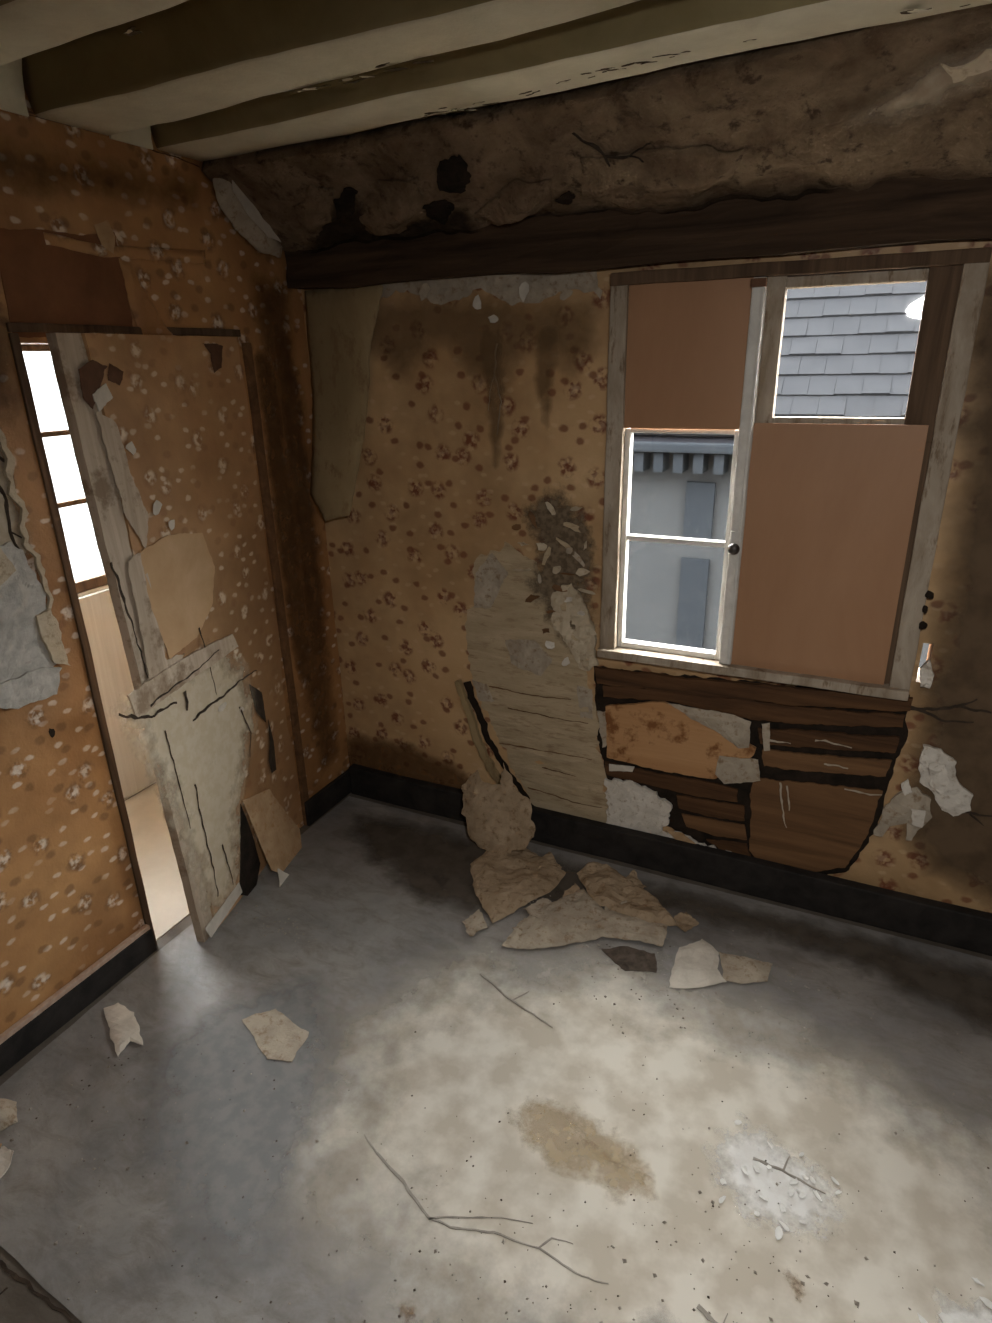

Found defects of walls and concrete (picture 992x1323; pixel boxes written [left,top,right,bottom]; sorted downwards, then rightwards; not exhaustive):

peeling [556,51,691,84]
flaking render [871,47,992,119]
water stain [373,303,586,444]
flaking render [0,542,71,709]
water stain [524,495,596,619]
flaking render [512,502,973,875]
crack [364,1134,609,1284]
water stain [153,964,992,1323]
peeling [917,1277,992,1323]